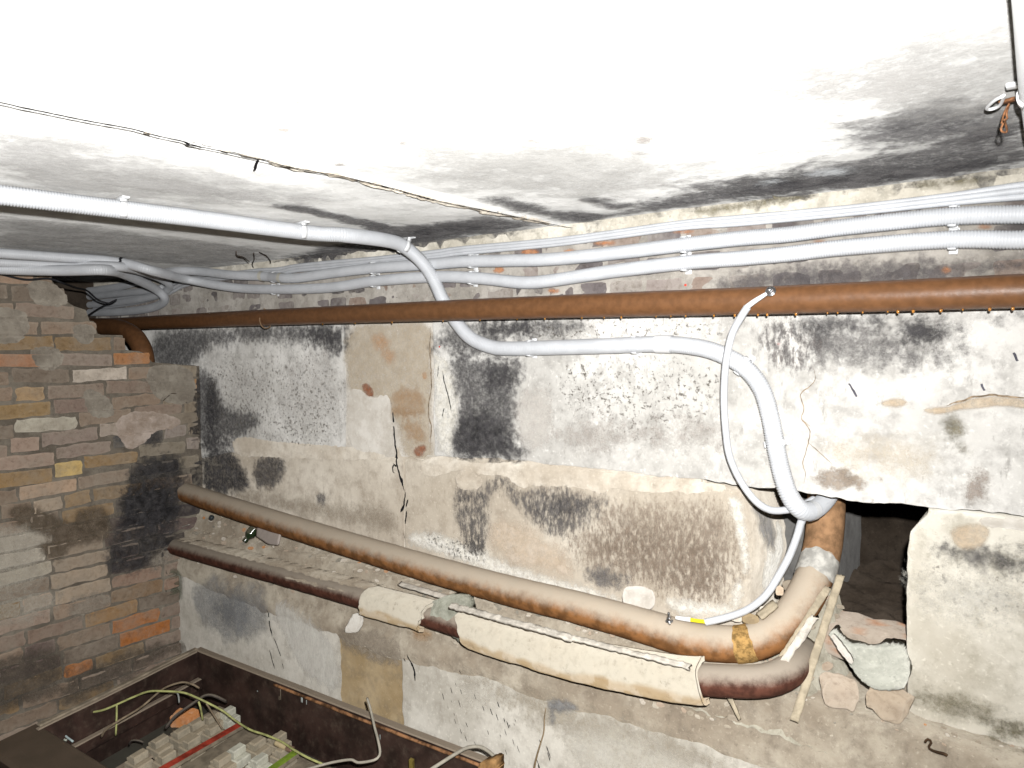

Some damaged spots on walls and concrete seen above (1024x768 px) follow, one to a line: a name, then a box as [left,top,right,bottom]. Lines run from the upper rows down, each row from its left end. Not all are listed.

leakage [799,18,1016,113]
leakage [0,220,262,265]
crack [0,102,571,228]
leakage [707,195,809,211]
leakage [153,326,348,365]
leakage [468,319,599,341]
leakage [188,356,336,501]
crack [392,413,408,538]
leakage [433,330,521,460]
leakage [152,550,182,596]
leakage [409,478,783,616]